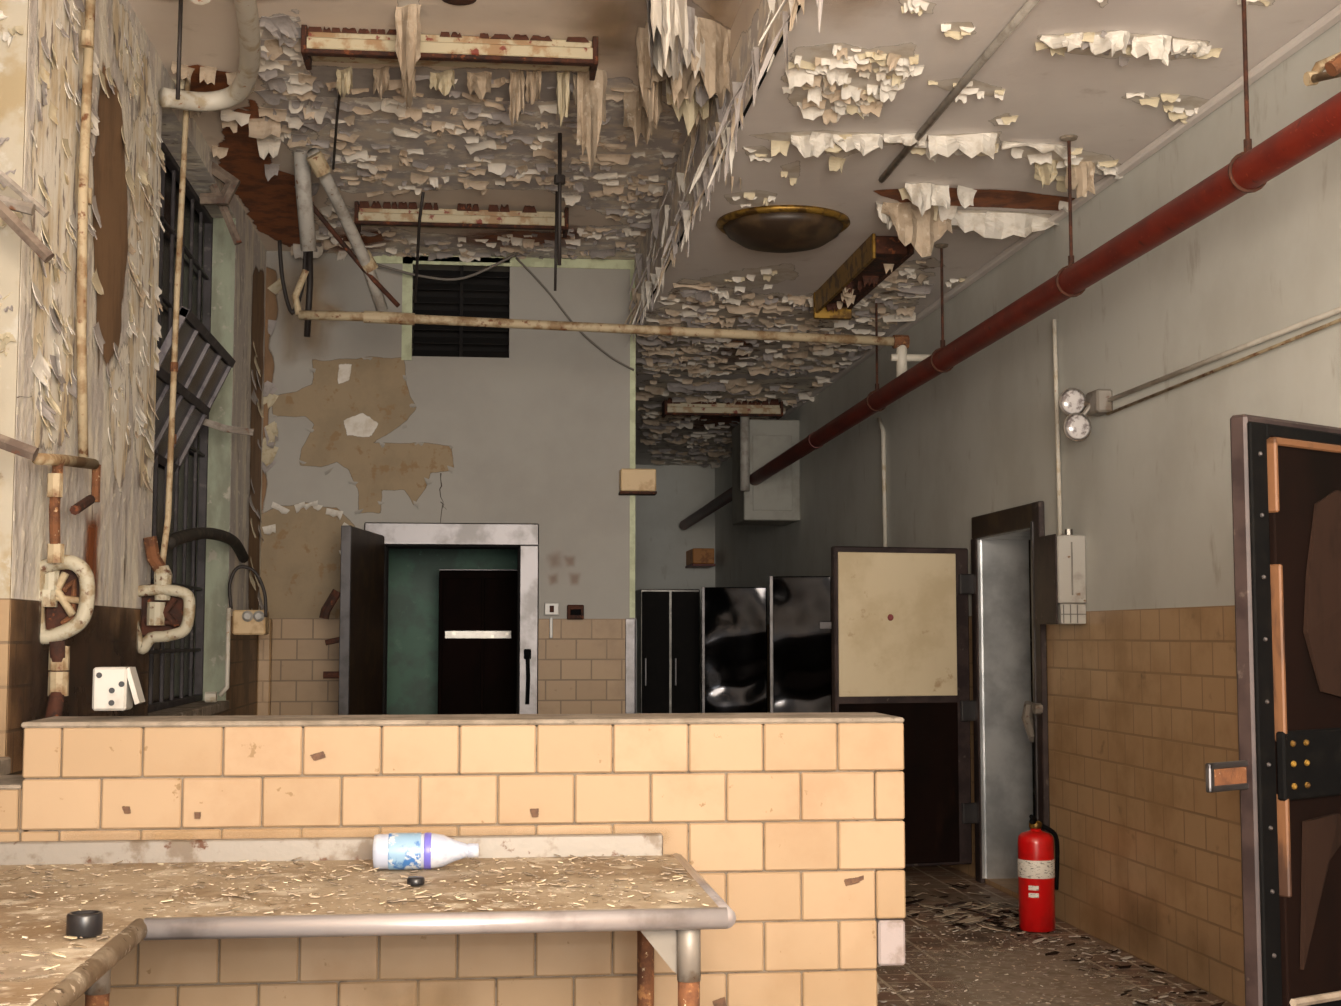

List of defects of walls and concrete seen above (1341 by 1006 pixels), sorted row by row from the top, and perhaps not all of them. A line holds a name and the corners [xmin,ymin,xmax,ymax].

peeling [0,0,166,493]
peeling [212,145,229,159]
peeling [220,0,1123,468]
peeling [1035,30,1223,67]
peeling [1122,92,1209,124]
flaking render [248,266,455,618]